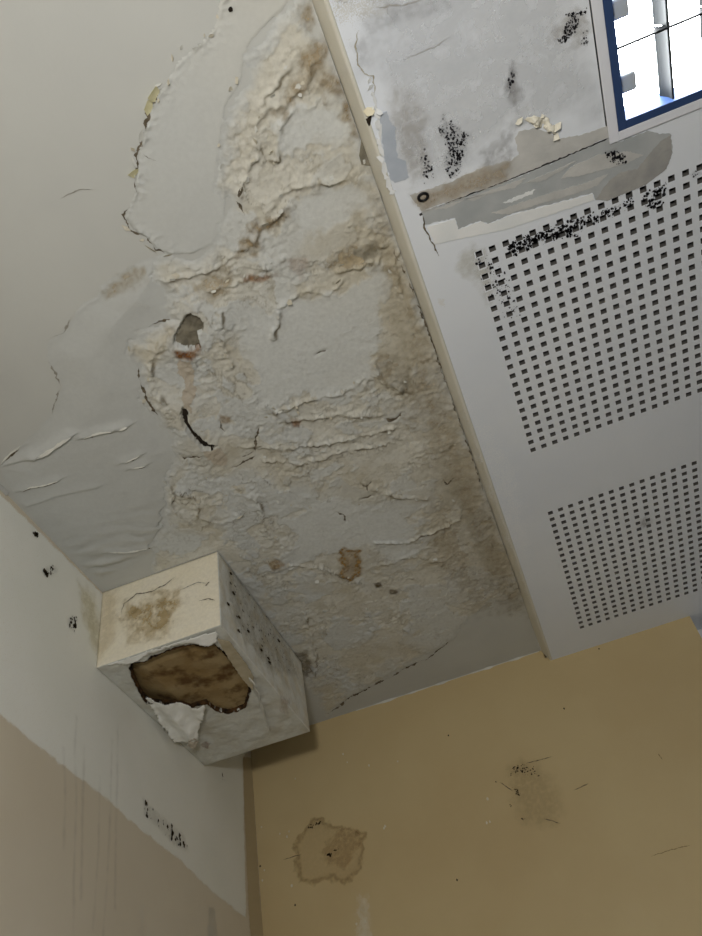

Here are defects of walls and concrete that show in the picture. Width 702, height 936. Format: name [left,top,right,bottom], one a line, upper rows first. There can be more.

mould [558,7,588,44]
crack [121,95,163,252]
mould [438,114,469,178]
mould [507,182,667,256]
water stain [475,257,520,318]
spalling [108,0,524,717]
crack [137,369,158,415]
crack [182,408,225,460]
crack [234,428,259,467]
water stain [128,598,176,630]
crack [121,579,213,612]
water stain [227,570,310,672]